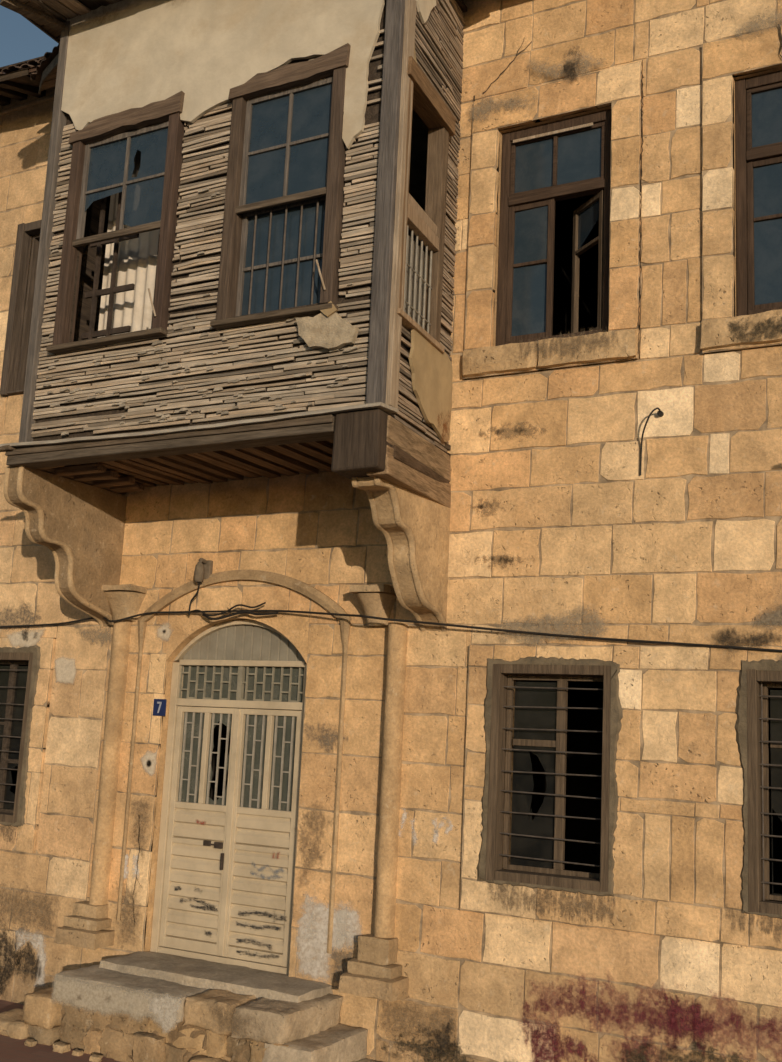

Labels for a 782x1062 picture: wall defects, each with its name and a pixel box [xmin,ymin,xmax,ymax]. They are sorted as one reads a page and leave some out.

crack [774,24,782,58]
peeling [295,301,359,350]
water stain [730,317,782,342]
water stain [490,884,615,921]
water stain [332,952,352,981]
water stain [659,995,748,1062]